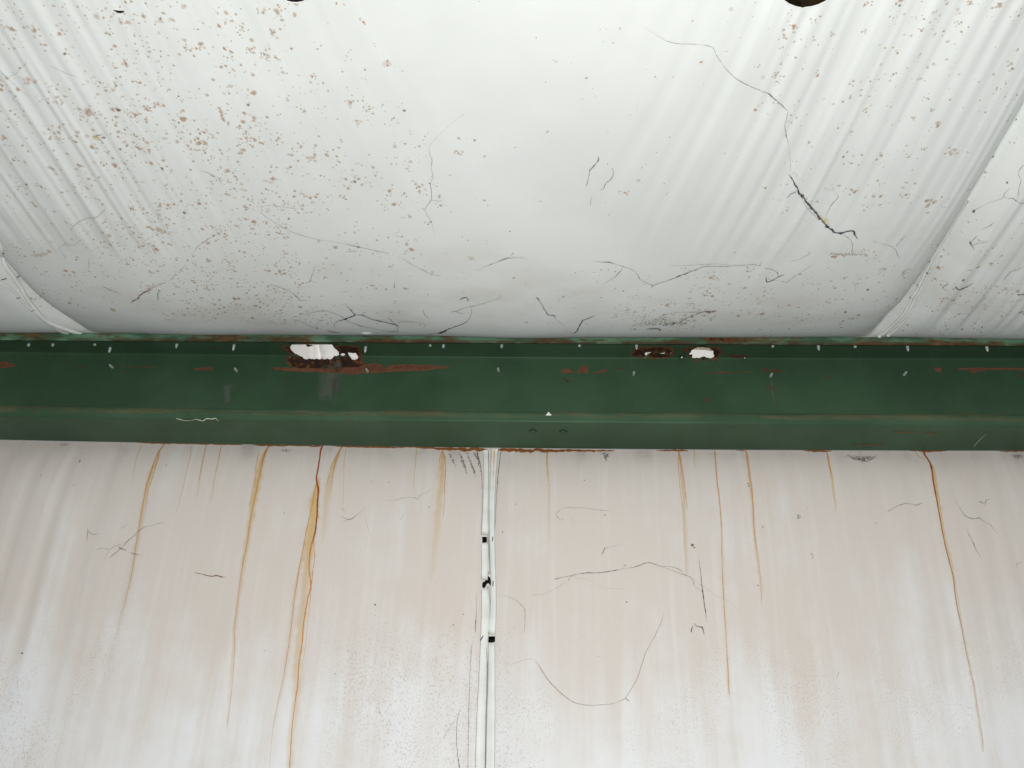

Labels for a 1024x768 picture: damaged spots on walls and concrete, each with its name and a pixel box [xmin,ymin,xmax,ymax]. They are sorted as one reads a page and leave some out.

crack [705,45,788,138]
crack [787,172,857,257]
crack [276,271,400,333]
rust [273,335,449,375]
rust [920,451,964,638]
rust [239,445,323,768]
crack [556,548,707,633]